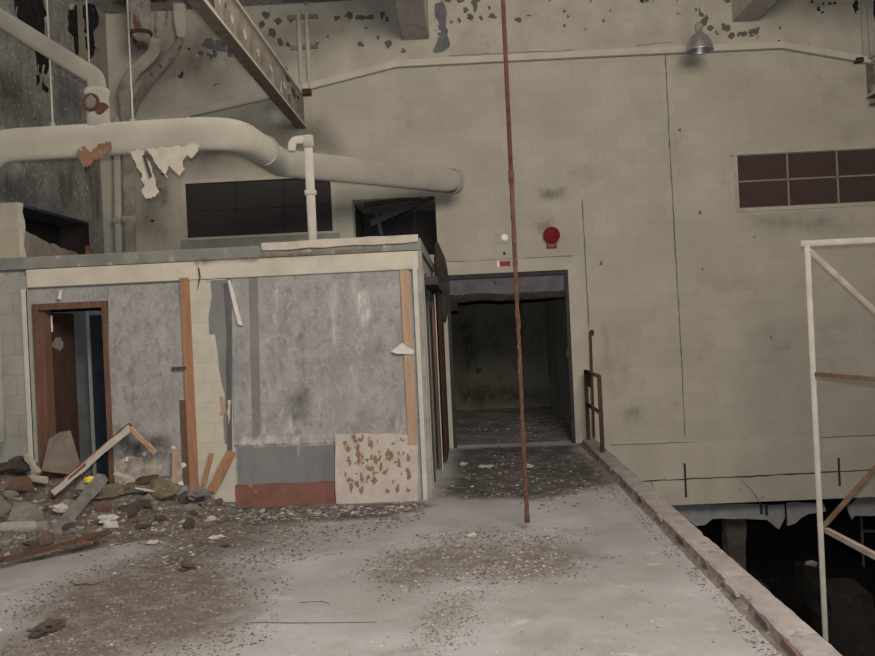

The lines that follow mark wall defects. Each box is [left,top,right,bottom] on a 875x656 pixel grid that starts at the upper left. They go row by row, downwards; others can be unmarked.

peeling [14,0,47,35]
peeling [68,1,104,59]
peeling [433,0,497,53]
peeling [35,51,54,93]
spalling [671,497,875,590]
spalling [754,613,770,630]
spalling [780,638,800,656]